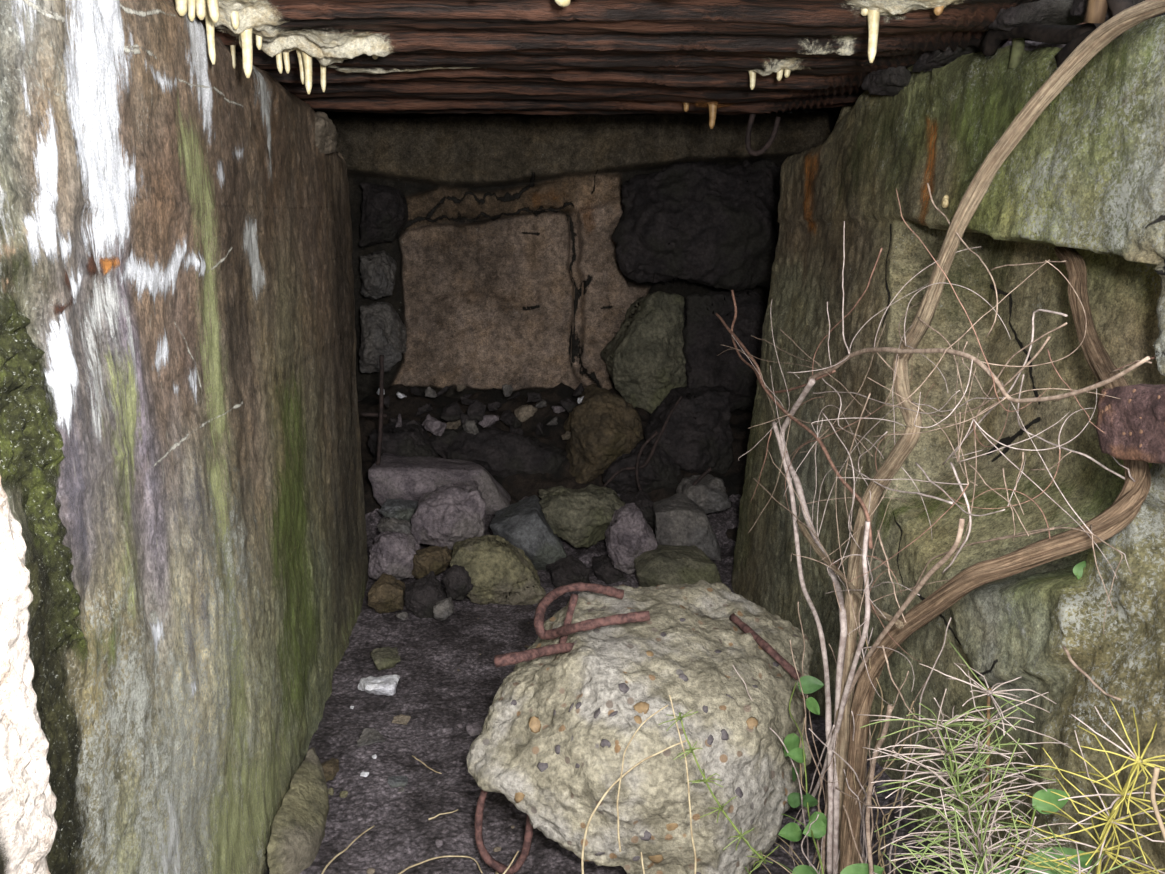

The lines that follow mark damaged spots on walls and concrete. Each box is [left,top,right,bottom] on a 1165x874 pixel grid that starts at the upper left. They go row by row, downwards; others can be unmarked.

leakage [146,0,481,168]
leakage [748,0,963,90]
leakage [0,0,206,438]
leakage [243,217,265,297]
crack [361,170,612,388]
crack [1145,215,1165,228]
leakage [0,475,58,874]